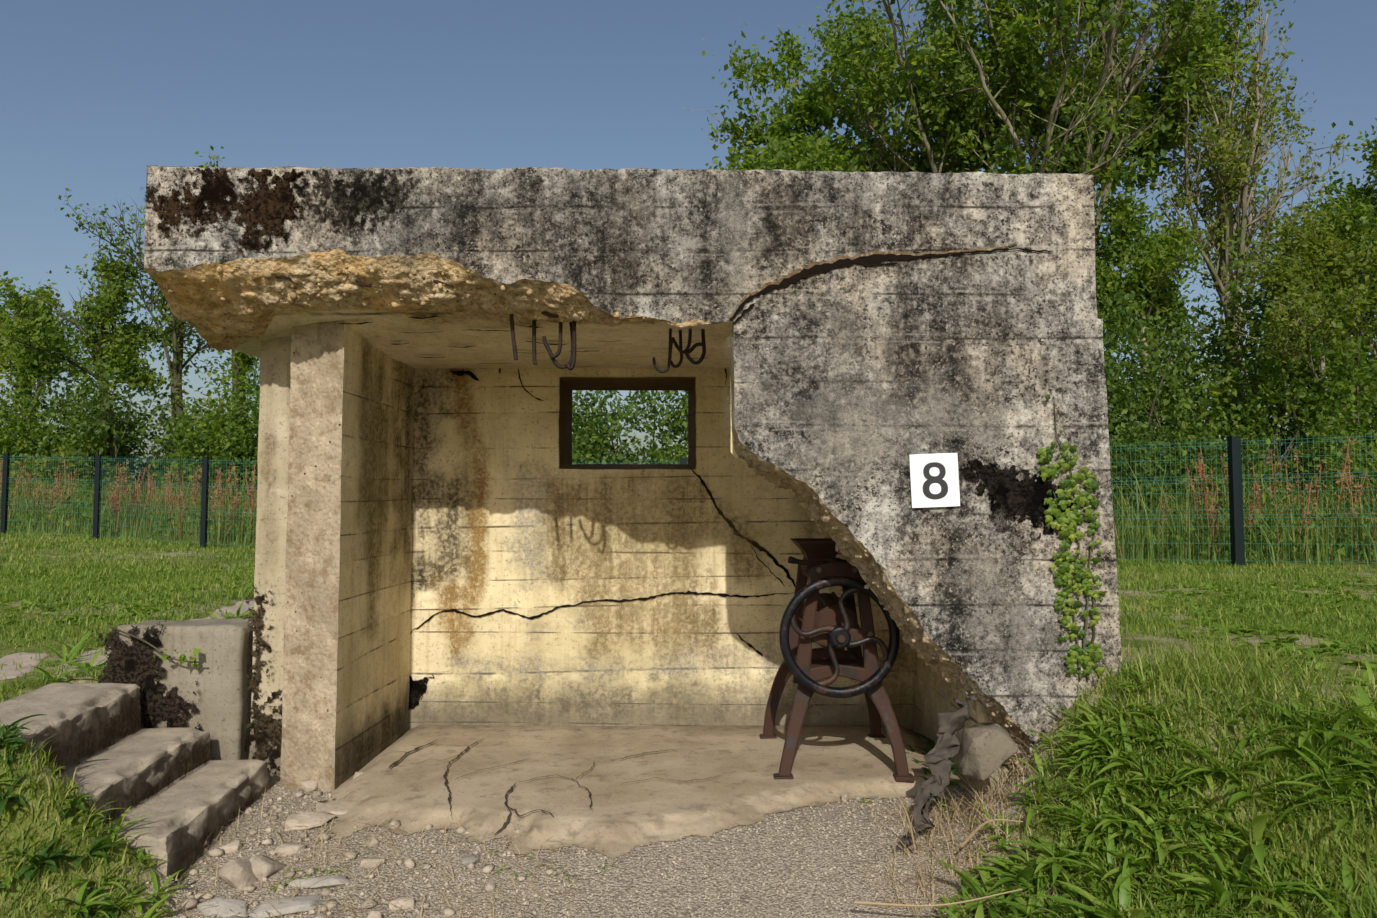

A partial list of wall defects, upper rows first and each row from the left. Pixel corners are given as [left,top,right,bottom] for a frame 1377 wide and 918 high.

crack [729,243,1052,325]
water stain [358,345,471,630]
spalling [146,250,1030,770]
crack [410,469,795,634]
crack [737,634,763,656]
crack [386,738,722,835]